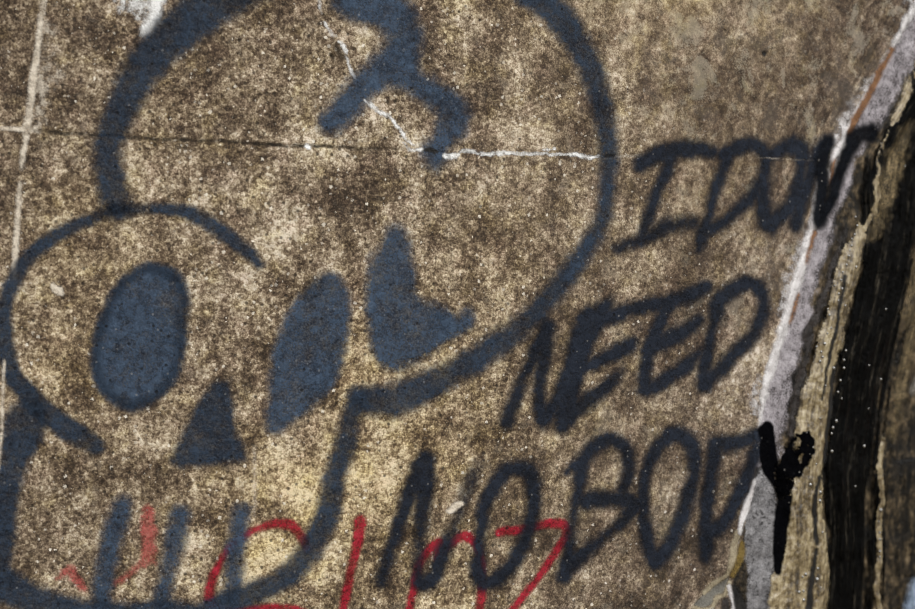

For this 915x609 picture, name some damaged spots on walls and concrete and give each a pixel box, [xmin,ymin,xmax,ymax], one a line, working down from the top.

crack [319,5,355,78]
crack [0,125,27,133]
crack [49,129,99,137]
crack [364,100,629,160]
crack [124,136,380,150]